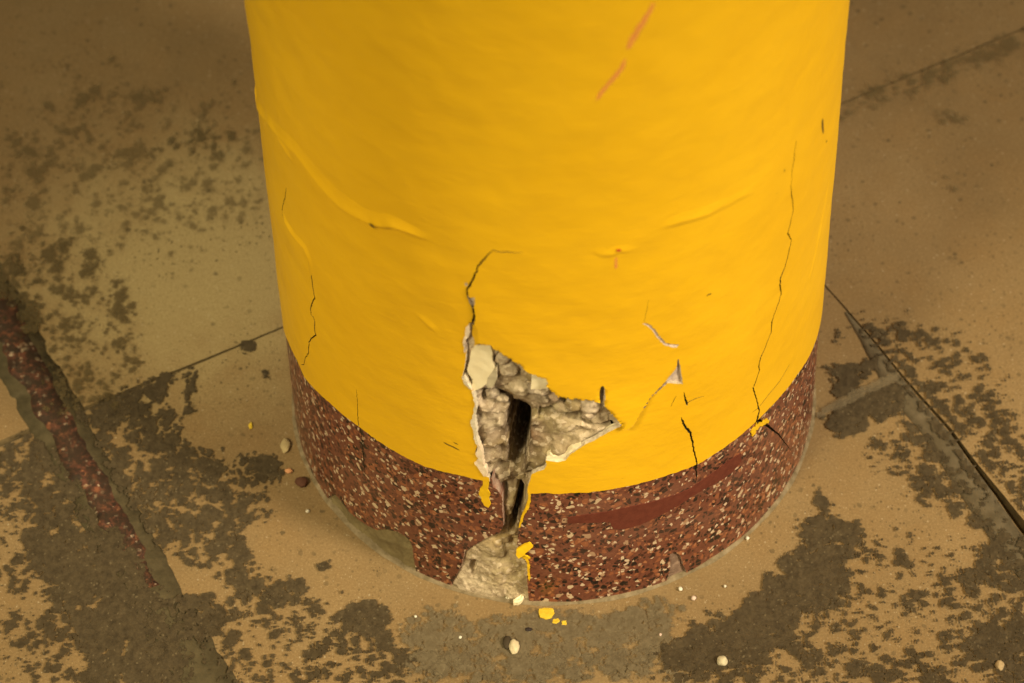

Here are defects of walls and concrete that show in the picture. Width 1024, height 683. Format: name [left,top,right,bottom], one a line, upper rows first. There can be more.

crack [301,276,316,365]
crack [465,250,516,325]
crack [753,142,797,449]
peeling [637,361,681,419]
spalling [453,322,629,605]
crack [671,393,703,480]